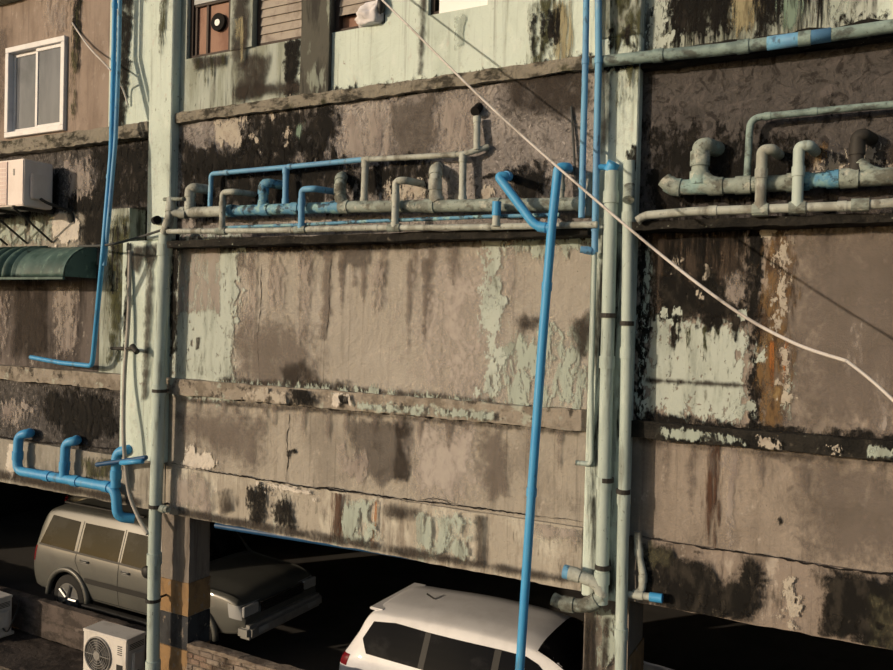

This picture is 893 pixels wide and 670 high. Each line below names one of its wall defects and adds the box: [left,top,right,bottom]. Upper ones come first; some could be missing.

leakage [606,0,888,54]
leakage [177,88,463,225]
leakage [176,237,578,499]
peeling [171,233,591,421]
peeling [633,229,798,450]
corrosion [755,230,801,428]
peeling [341,498,380,544]
leakage [178,482,568,582]
crack [172,400,580,522]
peeling [416,510,476,564]
leakage [642,543,769,622]
crack [643,536,893,578]